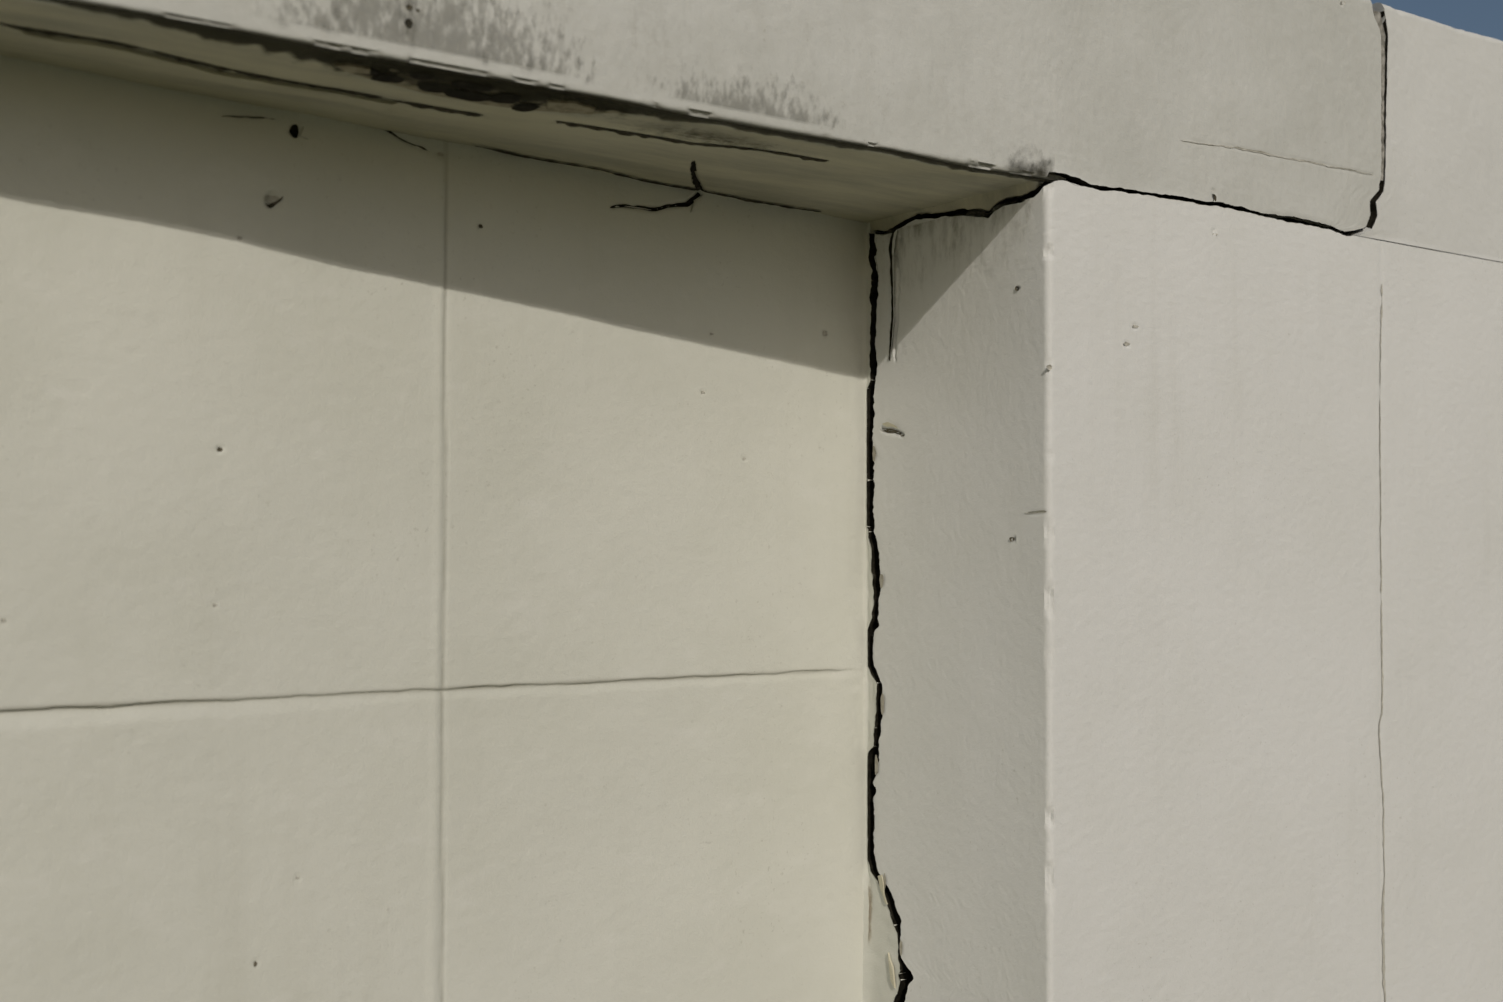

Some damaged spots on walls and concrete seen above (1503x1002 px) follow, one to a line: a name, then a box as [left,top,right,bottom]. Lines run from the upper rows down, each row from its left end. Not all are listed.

crack [476,121,829,212]
crack [867,7,1388,1002]